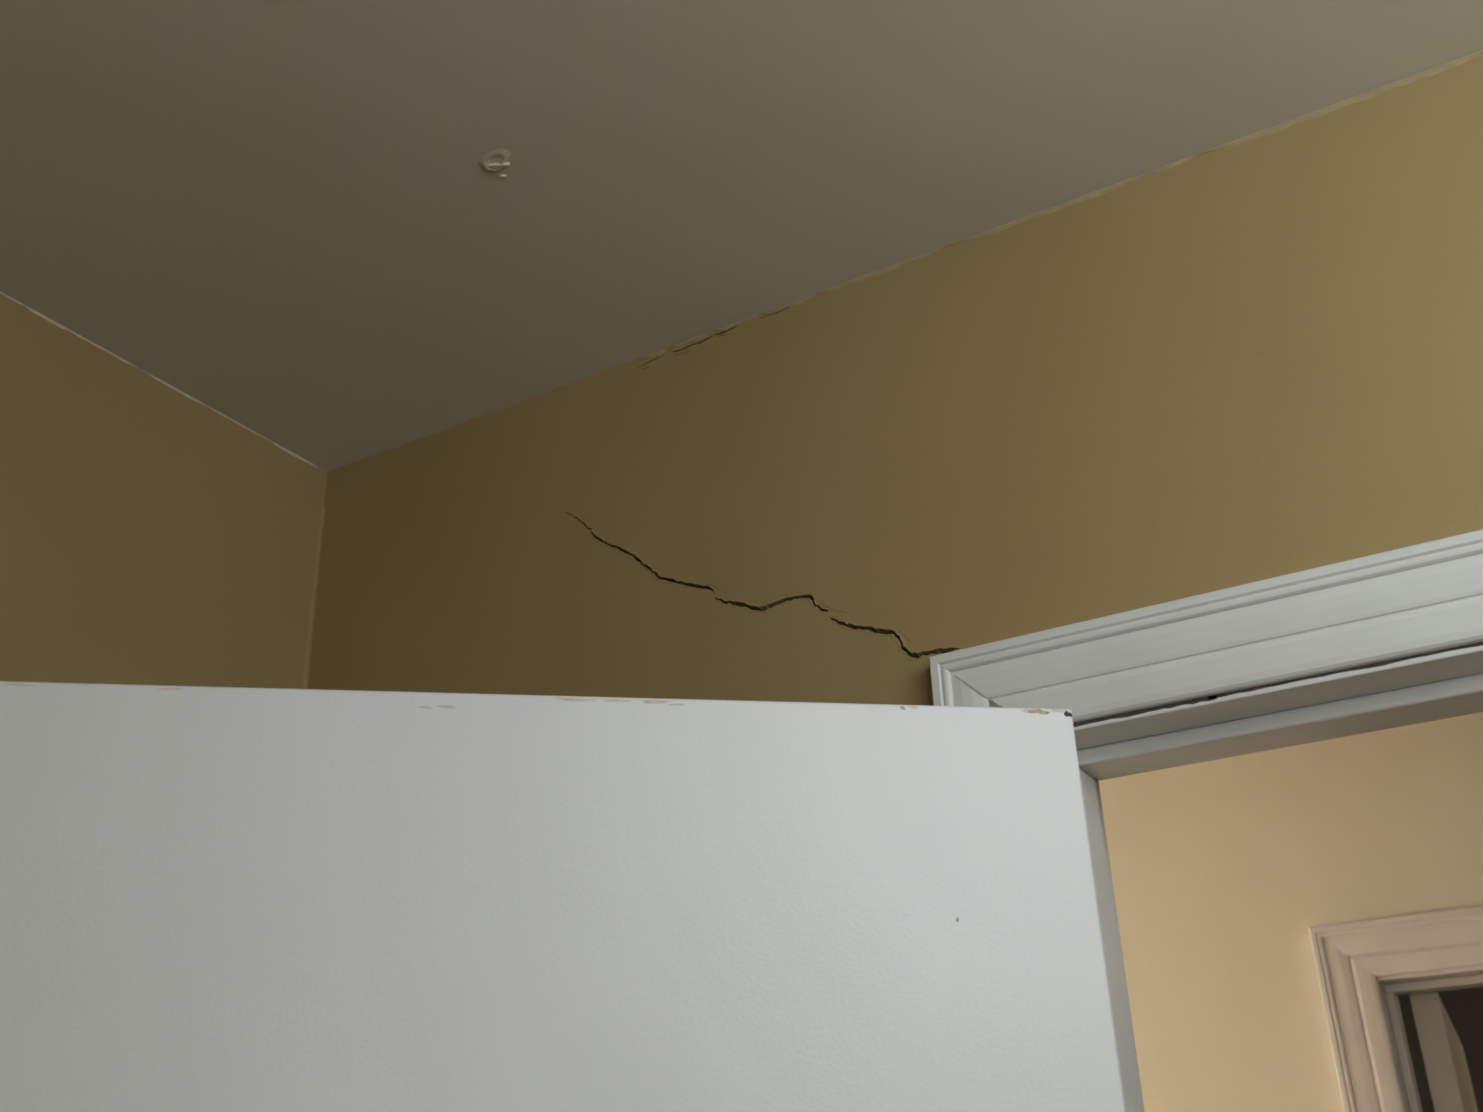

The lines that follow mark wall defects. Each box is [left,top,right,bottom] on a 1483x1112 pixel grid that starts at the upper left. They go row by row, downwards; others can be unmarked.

crack [555,509,1001,707]